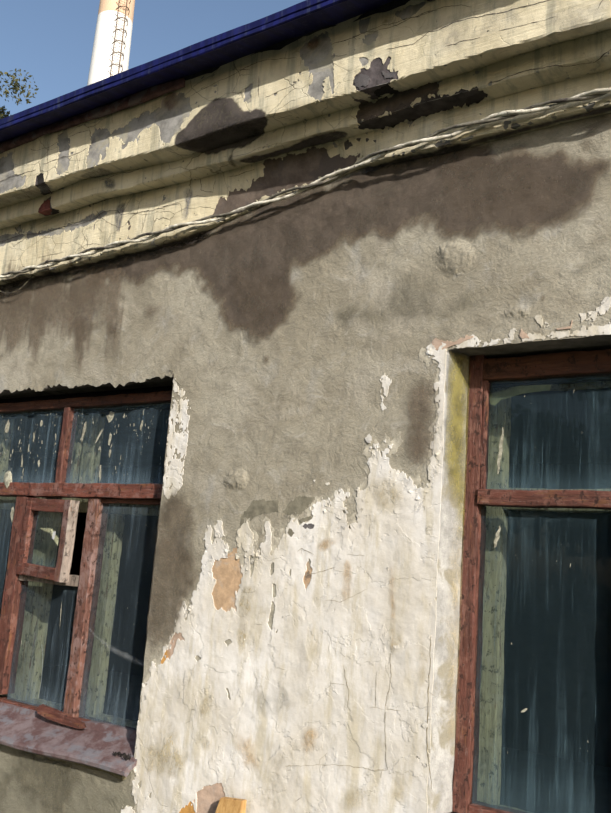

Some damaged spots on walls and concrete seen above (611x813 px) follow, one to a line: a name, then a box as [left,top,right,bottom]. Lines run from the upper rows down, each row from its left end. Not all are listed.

peeling [300,29,335,102]
crack [331,0,557,56]
crack [489,50,610,83]
peeling [0,152,60,216]
crack [0,130,254,261]
water stain [0,97,611,349]
peeling [211,57,488,219]
water stain [147,499,193,644]
peeling [121,296,611,813]
crack [288,653,398,773]